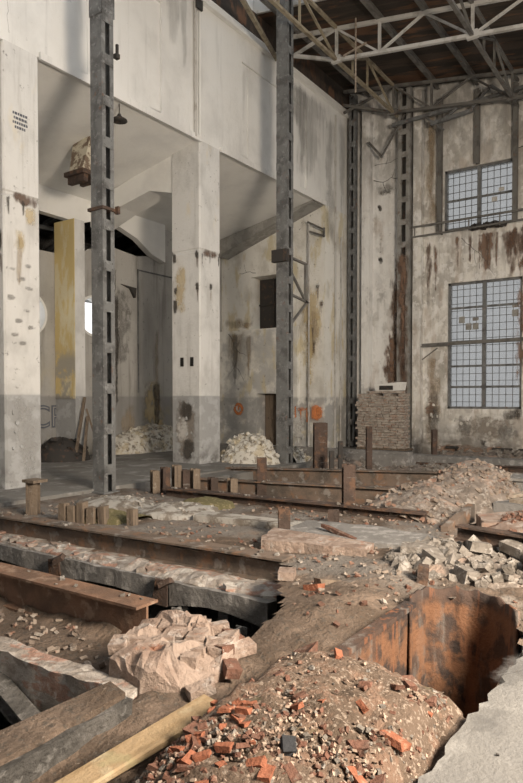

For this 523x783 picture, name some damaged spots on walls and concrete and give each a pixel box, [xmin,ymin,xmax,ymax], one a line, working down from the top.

corrosion [469,228,523,274]
corrosion [383,255,408,394]
spalling [175,400,195,458]